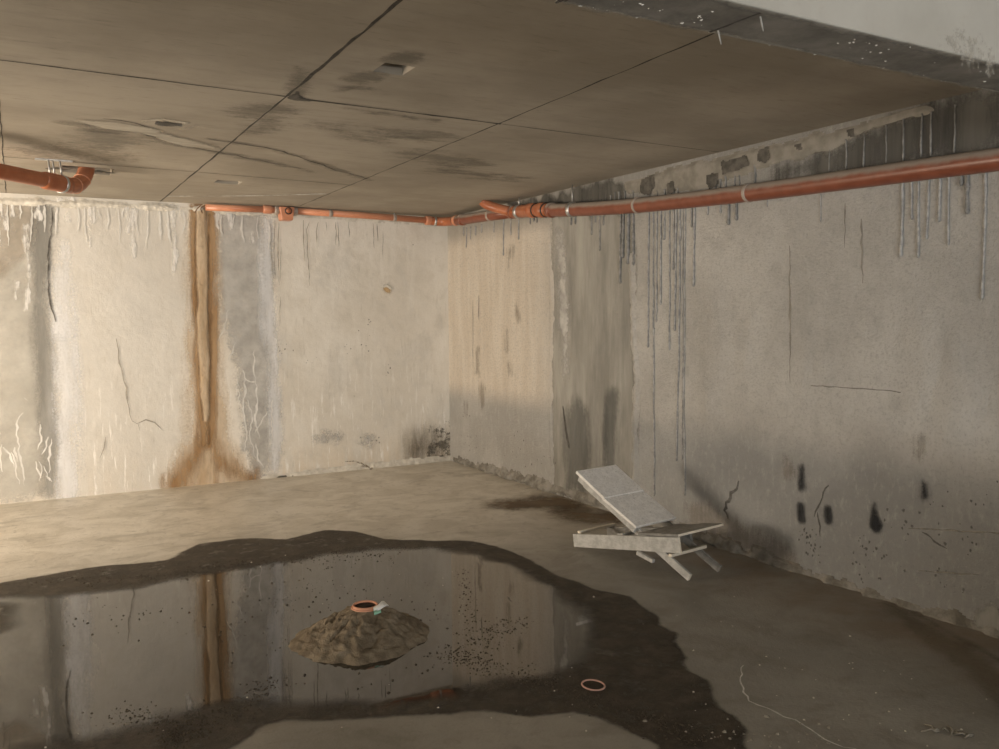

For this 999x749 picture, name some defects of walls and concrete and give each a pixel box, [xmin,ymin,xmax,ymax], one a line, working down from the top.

crack [81,119,364,178]
flaking render [624,106,934,195]
crack [47,209,56,322]
water stain [0,196,186,502]
crack [116,339,160,428]
corrosion [166,204,258,488]
crack [724,481,739,518]
water stain [797,503,805,522]
water stain [824,506,832,524]
water stain [870,507,882,532]
water stain [0,530,746,749]